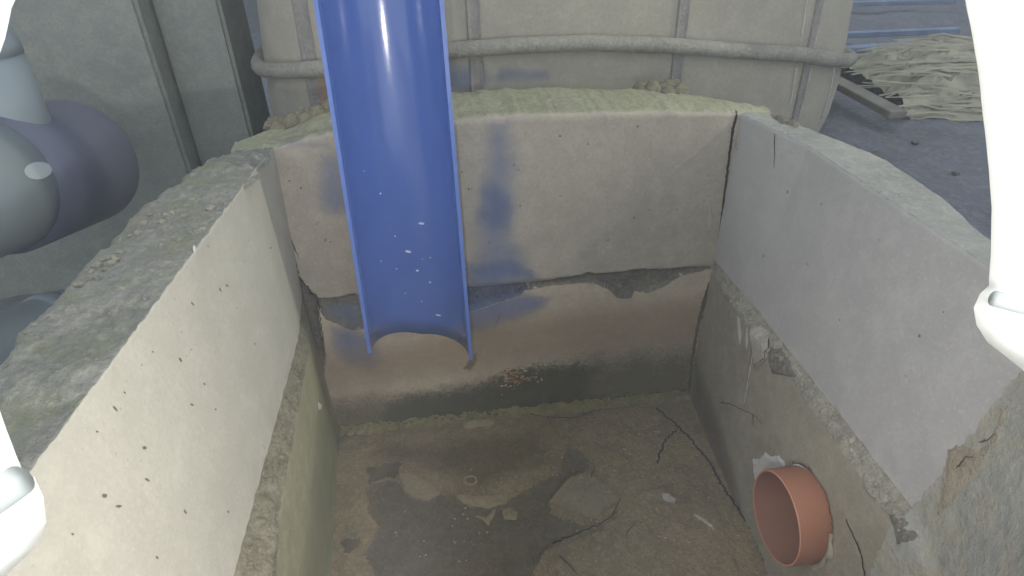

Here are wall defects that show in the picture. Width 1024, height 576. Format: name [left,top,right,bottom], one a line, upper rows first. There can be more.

crack [717,110,738,241]
spalling [467,266,711,312]
leakage [384,364,589,423]
peeling [750,325,797,378]
crack [529,407,764,572]
flaking render [937,405,1008,517]